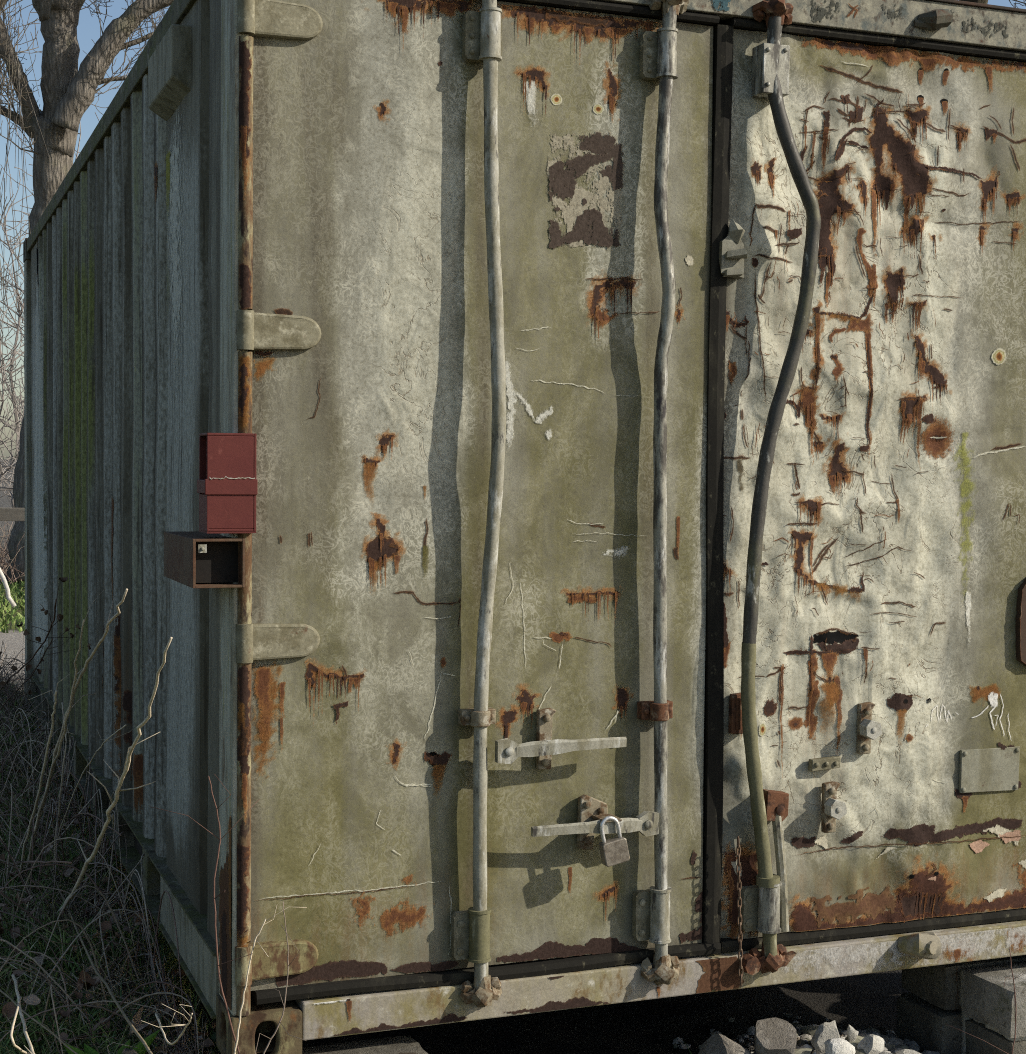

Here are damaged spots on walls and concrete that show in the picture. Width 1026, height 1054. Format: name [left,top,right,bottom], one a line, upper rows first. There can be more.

rust [378,0,479,48]
rust [801,36,1026,92]
peeling [547,131,625,249]
rust [587,276,659,339]
rust [786,91,1025,605]
rust [362,432,396,498]
rust [363,513,406,589]
rust [305,660,364,724]
rust [772,635,868,751]
rust [237,662,286,823]
rust [218,816,250,1011]
rust [789,856,1026,932]